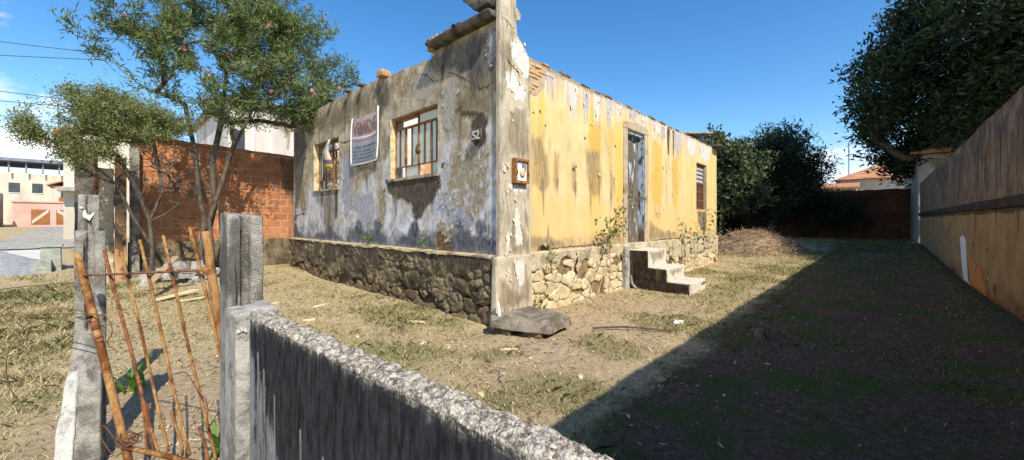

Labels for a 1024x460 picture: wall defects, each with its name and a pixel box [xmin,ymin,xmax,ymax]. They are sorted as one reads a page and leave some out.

flaking render [505,40,557,127]
peeling [569,83,710,167]
water stain [386,174,496,267]
spalling [392,66,623,309]
water stain [587,151,615,199]